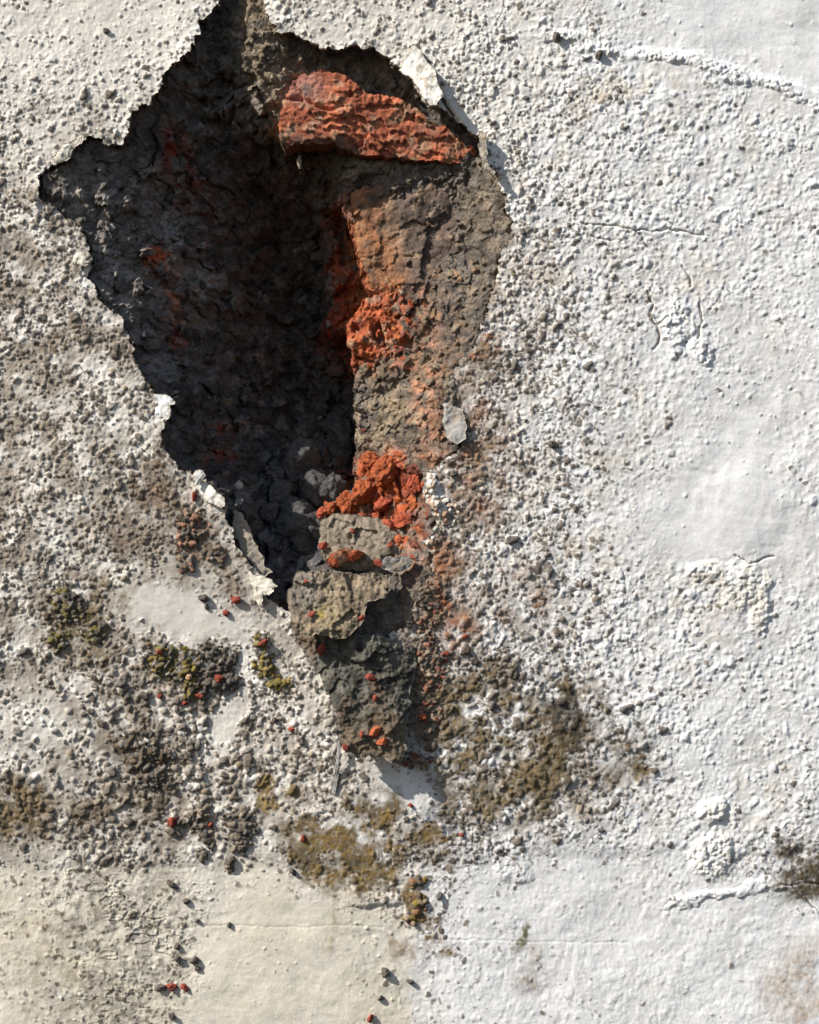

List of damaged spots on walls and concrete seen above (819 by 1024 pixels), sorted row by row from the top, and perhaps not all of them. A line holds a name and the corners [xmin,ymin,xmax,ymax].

spalling [37,0,513,794]
damp [427,665,612,824]
damp [610,739,650,783]
damp [402,878,424,910]